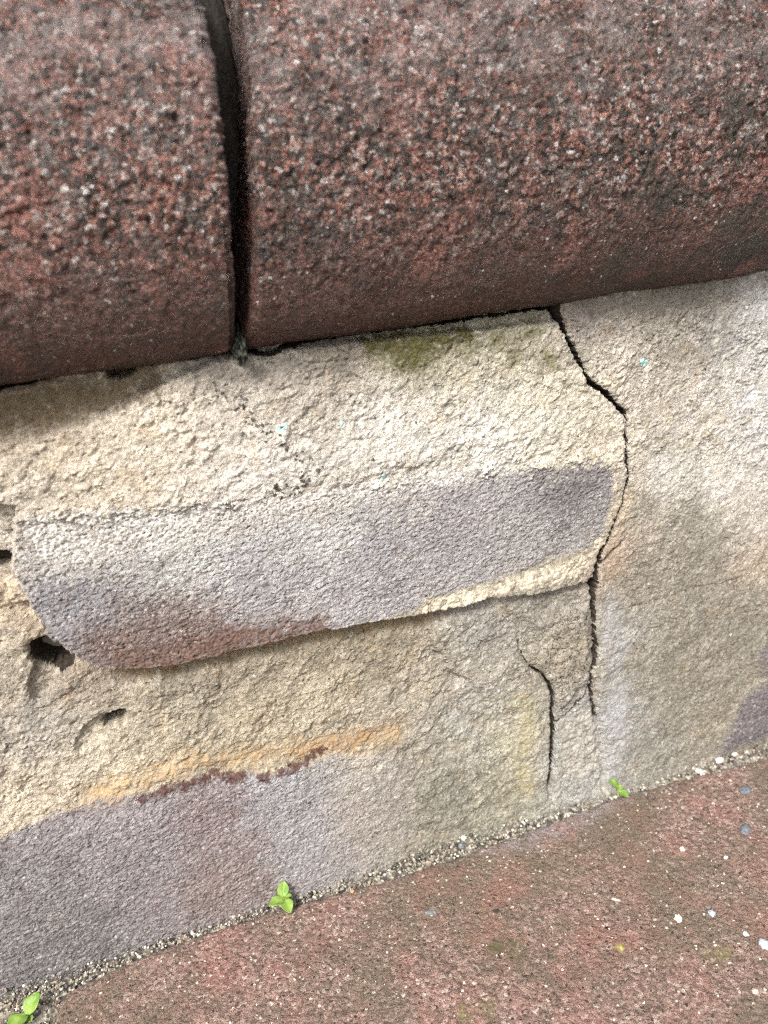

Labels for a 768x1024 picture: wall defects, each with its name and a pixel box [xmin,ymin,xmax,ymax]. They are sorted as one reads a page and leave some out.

crack [247,305,629,784]